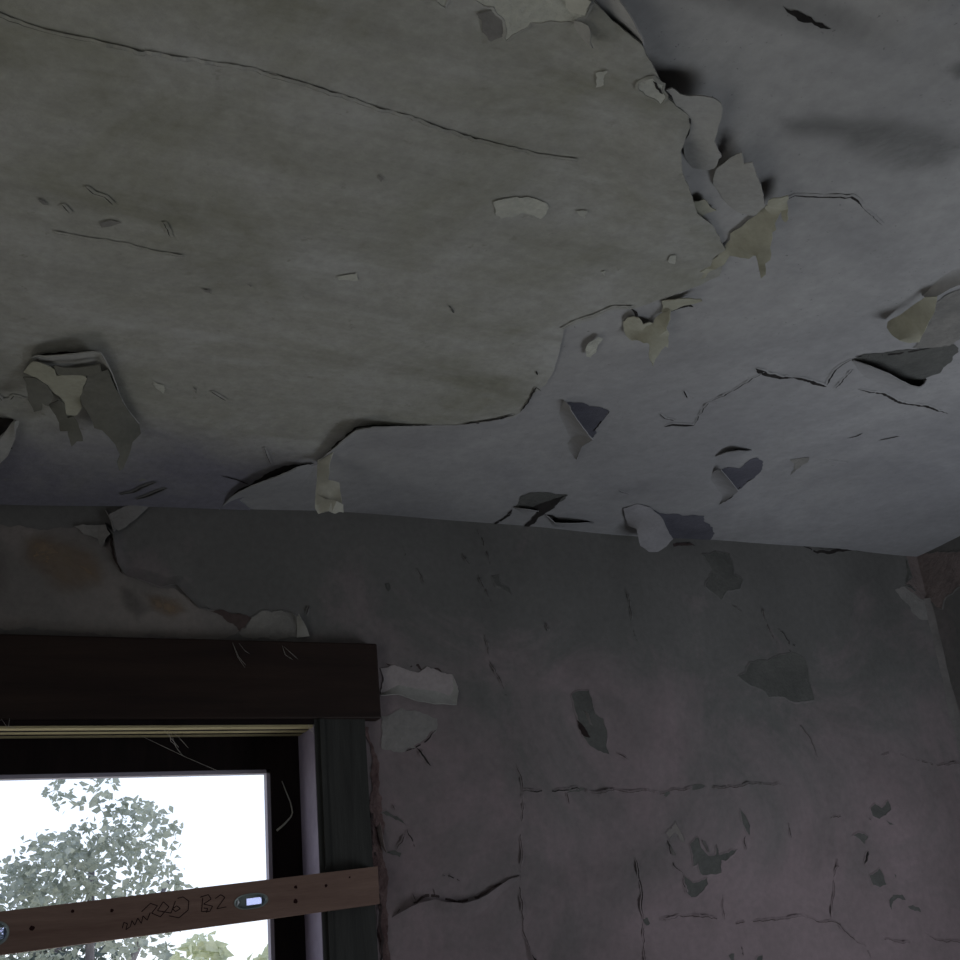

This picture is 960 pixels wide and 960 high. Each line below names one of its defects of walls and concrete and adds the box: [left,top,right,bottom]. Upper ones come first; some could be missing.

flaking render [473,0,645,48]
flaking render [635,76,789,279]
flaking render [23,351,141,471]
flaking render [219,387,541,514]
peeling [559,401,609,460]
flaking render [561,289,702,365]
crack [658,358,949,427]
peeling [852,269,960,396]
flaking render [0,481,311,641]
peeling [365,664,520,960]
crack [515,764,786,960]
crack [634,847,960,960]